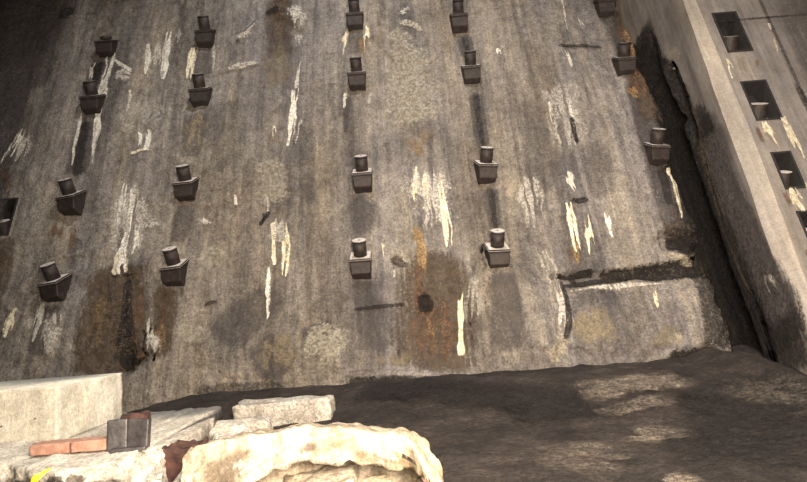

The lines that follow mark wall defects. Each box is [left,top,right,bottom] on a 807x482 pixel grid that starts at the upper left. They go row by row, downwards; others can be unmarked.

leakage [67,109,102,175]
efflorescence [88,54,132,97]
efflorescence [286,61,302,146]
leakage [542,85,587,145]
efflorescence [109,183,159,275]
leakage [214,219,290,343]
corrosion [380,228,477,371]
efflorescence [401,167,458,247]
leakage [565,202,594,254]
leakage [571,280,660,308]
crack [556,260,703,338]
leakage [602,1,807,482]